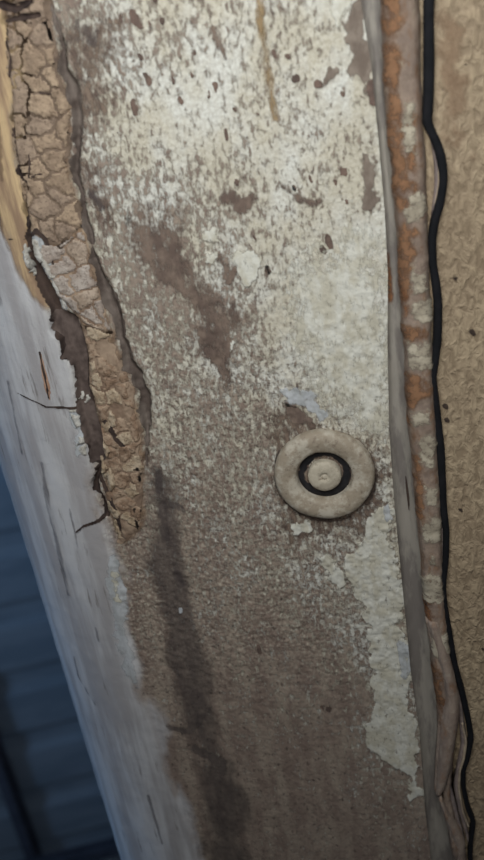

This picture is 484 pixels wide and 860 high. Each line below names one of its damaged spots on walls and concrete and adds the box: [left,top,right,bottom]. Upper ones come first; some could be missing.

peeling [118,9,165,29]
rust [380,0,417,212]
peeling [5,0,145,544]
crack [0,0,152,465]
water stain [132,203,248,388]
water stain [219,190,259,214]
water stain [282,185,323,206]
rust [387,223,429,342]
crack [76,445,121,533]
rust [412,454,424,520]
peeling [105,555,137,684]
water stain [154,470,246,860]